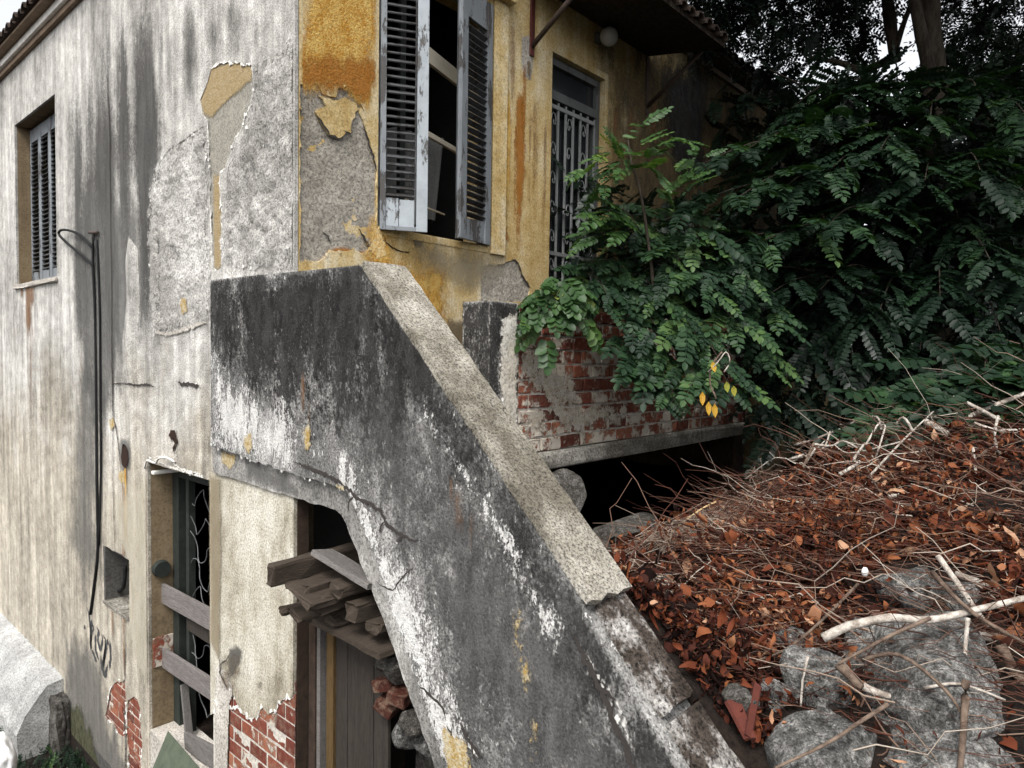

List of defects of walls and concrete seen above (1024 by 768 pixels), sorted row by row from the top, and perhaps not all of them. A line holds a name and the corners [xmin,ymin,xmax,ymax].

water stain [183,15,194,81]
spalling [147,37,387,340]
rust [506,42,546,240]
water stain [68,31,160,582]
peeling [480,259,621,436]
crack [293,462,423,542]
water stain [209,266,674,768]
spalling [106,679,142,768]
spalling [213,666,297,768]